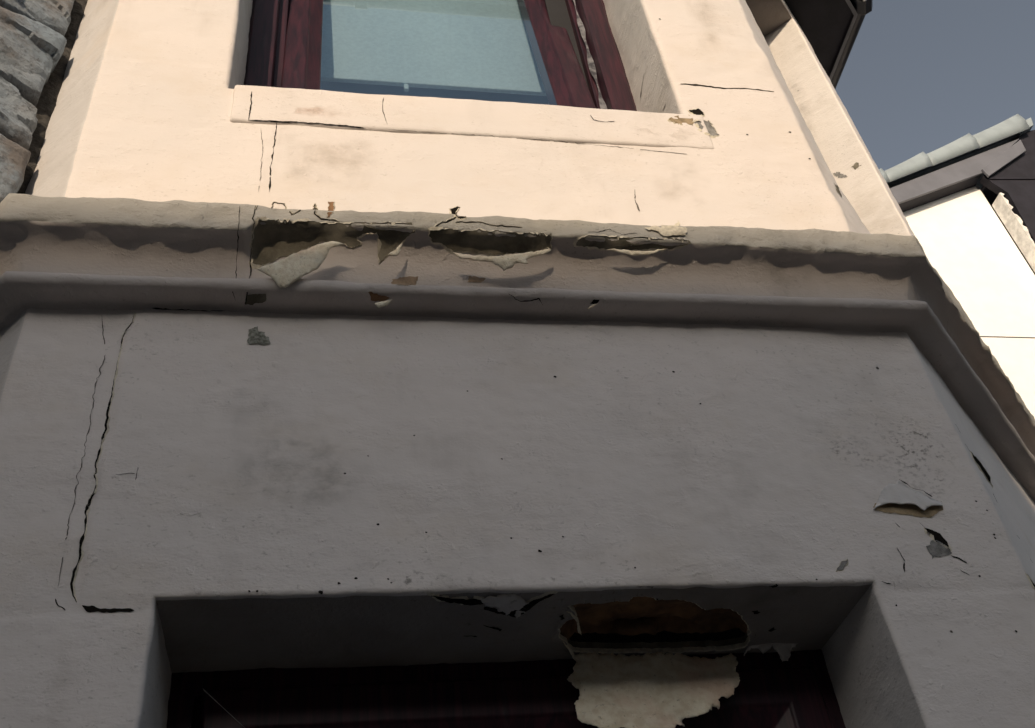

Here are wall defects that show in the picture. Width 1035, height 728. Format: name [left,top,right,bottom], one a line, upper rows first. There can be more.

spalling [667,108,719,138]
peeling [249,202,553,288]
peeling [573,222,691,256]
spalling [245,294,267,305]
peeling [368,292,392,308]
crack [55,92,684,613]
peeling [873,479,967,563]
peeling [427,591,558,618]
spalling [550,586,798,728]